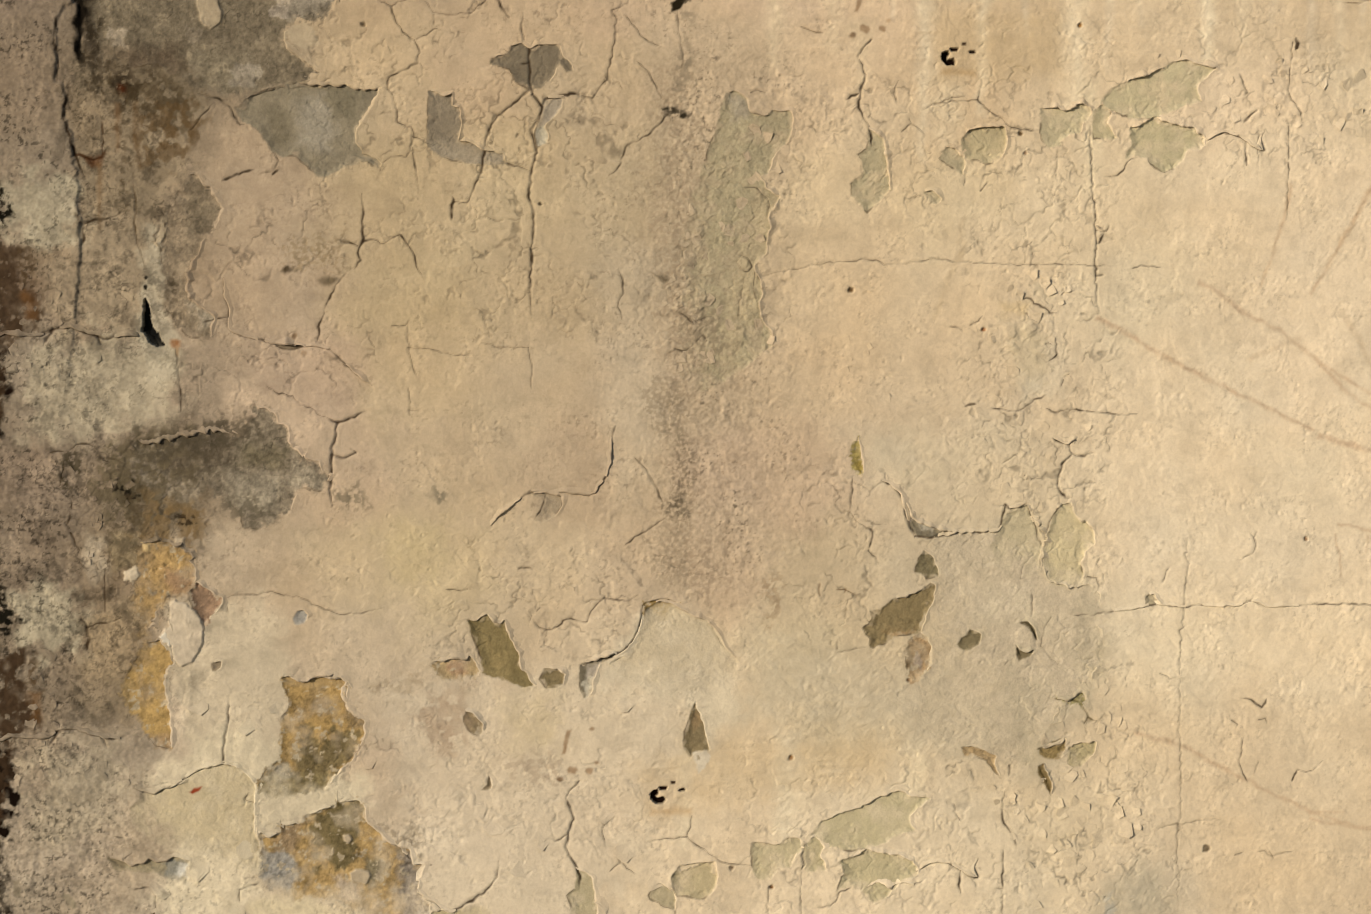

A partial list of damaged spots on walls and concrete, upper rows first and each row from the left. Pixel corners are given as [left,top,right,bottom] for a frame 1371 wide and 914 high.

water stain [0,177,19,233]
crack [51,0,167,268]
water stain [69,12,216,224]
flaking render [83,0,383,178]
crack [174,0,685,508]
water stain [0,584,26,640]
peeling [14,639,435,914]
water stain [50,394,537,680]
peeling [427,612,617,701]
crack [489,425,666,547]
crack [553,35,1371,914]
peeling [861,496,1142,865]